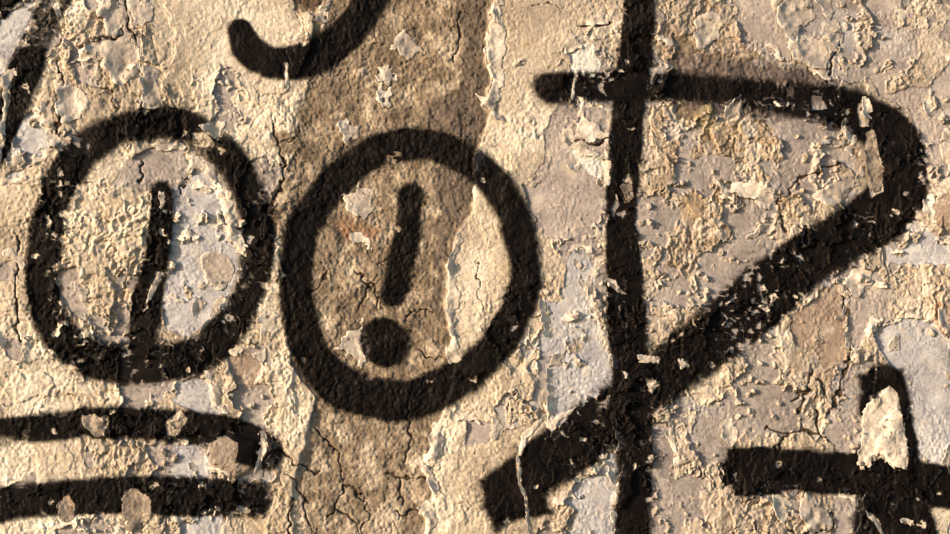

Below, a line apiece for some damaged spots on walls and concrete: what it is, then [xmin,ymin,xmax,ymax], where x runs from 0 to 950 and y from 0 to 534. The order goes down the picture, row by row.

peeling [0,0,163,186]
peeling [108,138,251,345]
peeling [171,370,229,415]
peeling [165,433,237,493]
peeling [172,505,232,534]
crack [281,427,371,534]
flaking render [254,311,445,534]
flaking render [260,0,507,387]
crack [385,420,426,517]
peeling [516,37,633,534]
peeling [790,267,950,473]
peeling [885,191,950,271]